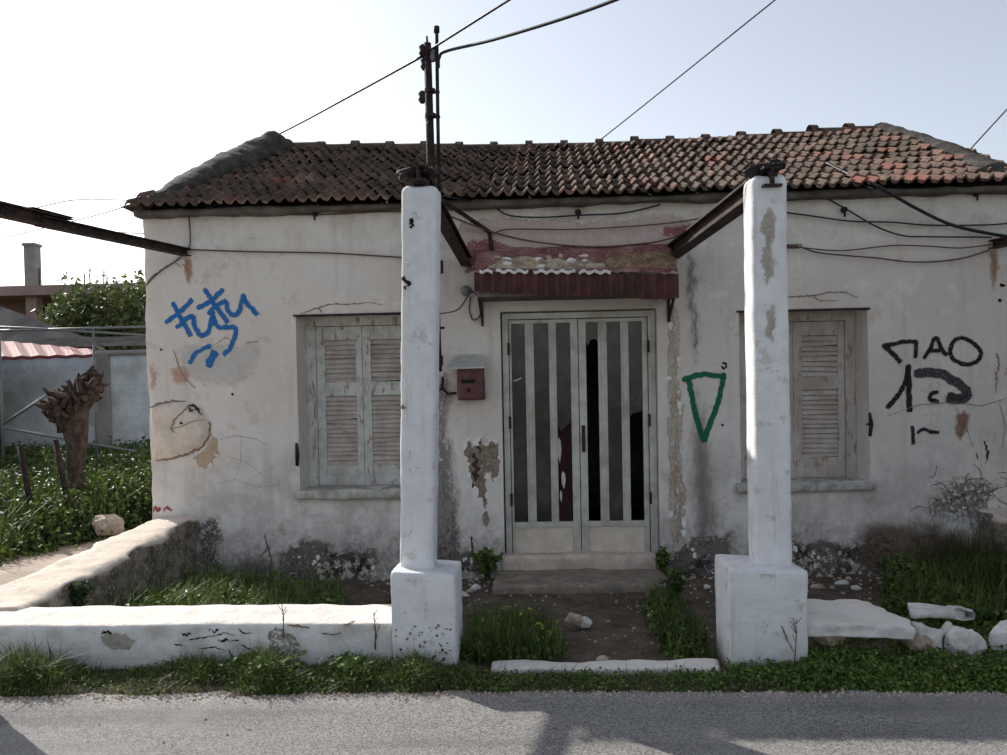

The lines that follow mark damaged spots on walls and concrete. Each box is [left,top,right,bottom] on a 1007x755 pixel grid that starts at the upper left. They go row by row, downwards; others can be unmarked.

peeling [459,215,690,275]
peeling [760,209,775,282]
crack [301,302,383,314]
crack [788,291,858,301]
spalling [192,437,219,468]
water stain [437,379,484,578]
spalling [462,436,500,527]
peeling [665,307,687,552]
rust [956,412,969,438]
water stain [199,519,223,573]
water stain [279,541,382,580]
spalling [101,630,133,650]